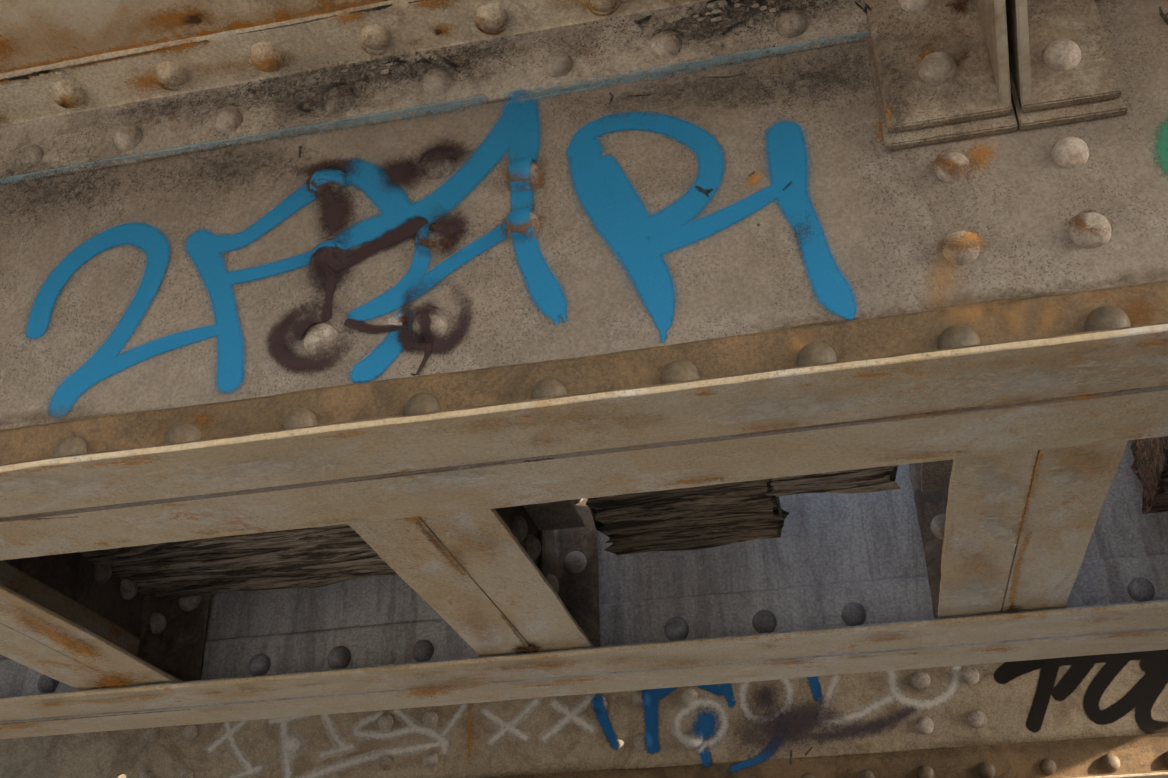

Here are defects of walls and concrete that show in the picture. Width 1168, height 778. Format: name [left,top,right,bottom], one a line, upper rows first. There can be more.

corrosion [0,0,390,84]
corrosion [730,388,1141,437]
corrosion [350,462,505,482]